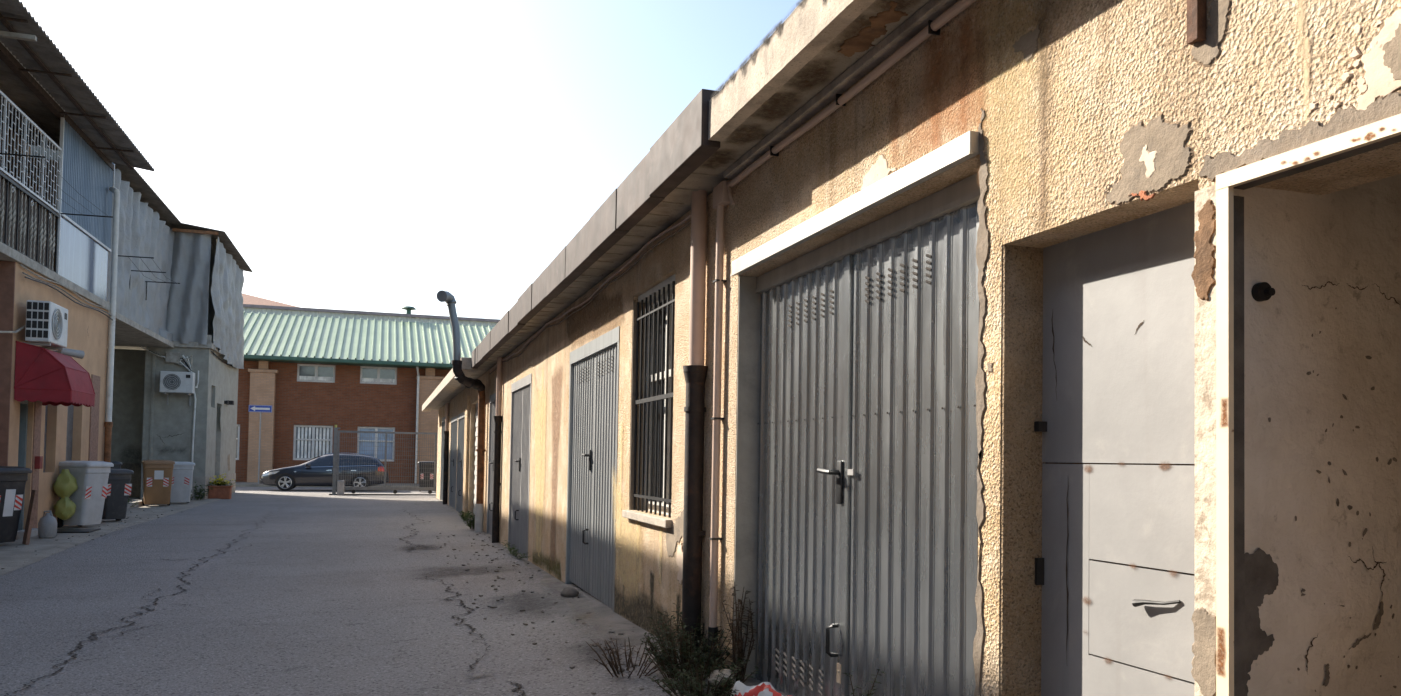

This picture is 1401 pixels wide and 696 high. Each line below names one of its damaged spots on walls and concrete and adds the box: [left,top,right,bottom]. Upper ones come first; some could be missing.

damp [713,23,781,97]
flaking render [1013,23,1042,64]
flaking render [1190,0,1232,67]
peeling [1305,4,1401,126]
peeling [860,154,897,191]
flaking render [1106,113,1227,206]
spalling [1191,199,1216,301]
crack [1348,547,1386,596]
spalling [1245,548,1279,696]